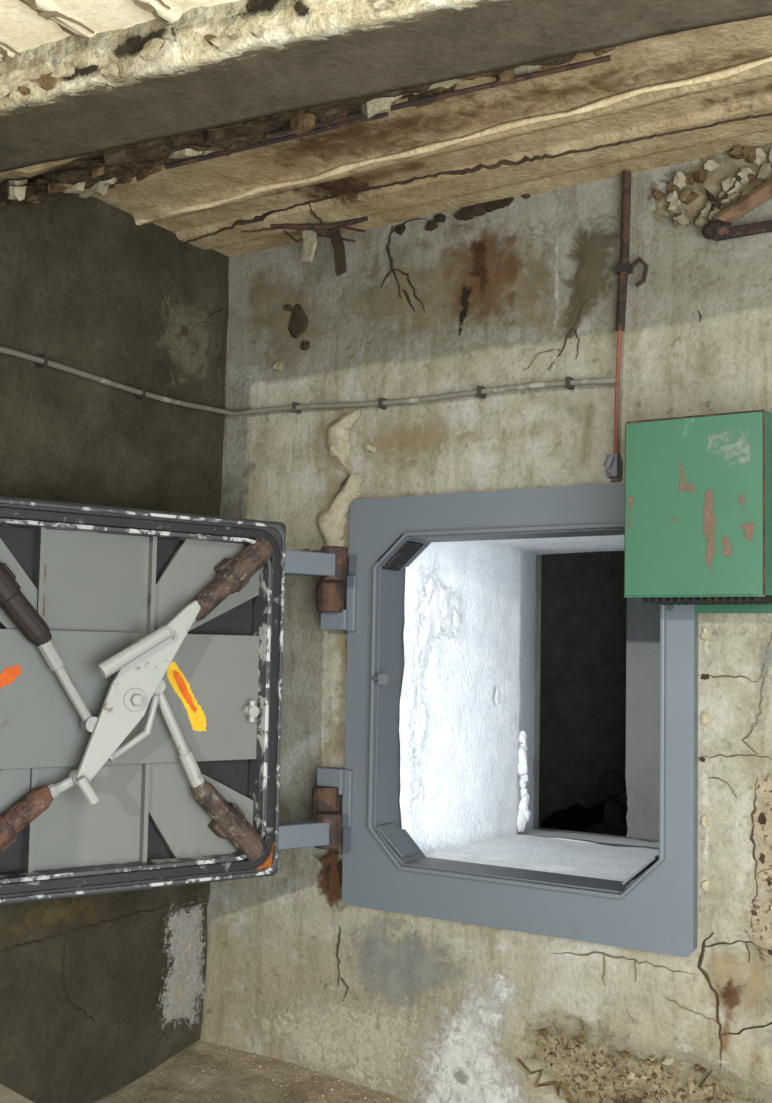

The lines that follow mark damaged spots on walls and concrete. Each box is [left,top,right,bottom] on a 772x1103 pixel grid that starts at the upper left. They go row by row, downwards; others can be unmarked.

crack [19,0,94,44]
crack [133,0,172,26]
spalling [0,47,616,207]
crack [184,113,772,244]
spalling [648,143,772,229]
water stain [373,217,618,338]
corrosion [317,849,344,909]
flaking render [744,773,772,965]
water stain [242,920,523,1103]
spalling [517,1016,764,1103]
crack [554,933,772,1068]
corrosion [710,953,765,1051]